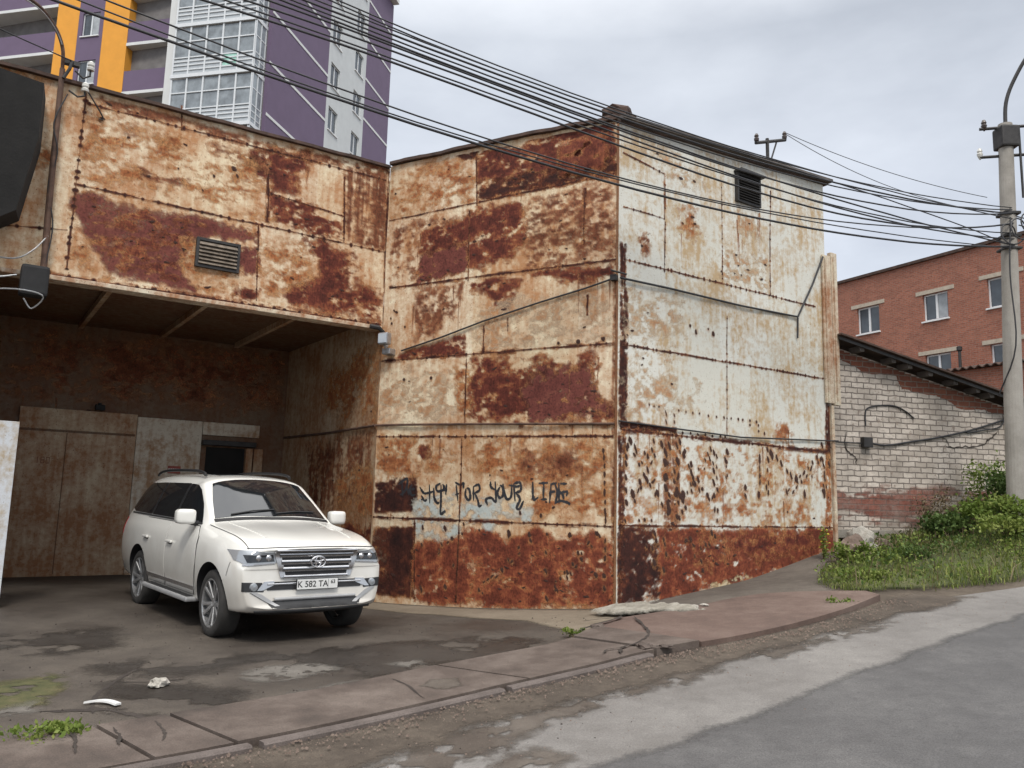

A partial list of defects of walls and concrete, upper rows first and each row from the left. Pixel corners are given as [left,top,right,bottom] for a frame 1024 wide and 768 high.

rust [8,93,834,609]
peeling [839,350,1004,414]
peeling [837,487,992,526]
crack [580,616,659,653]